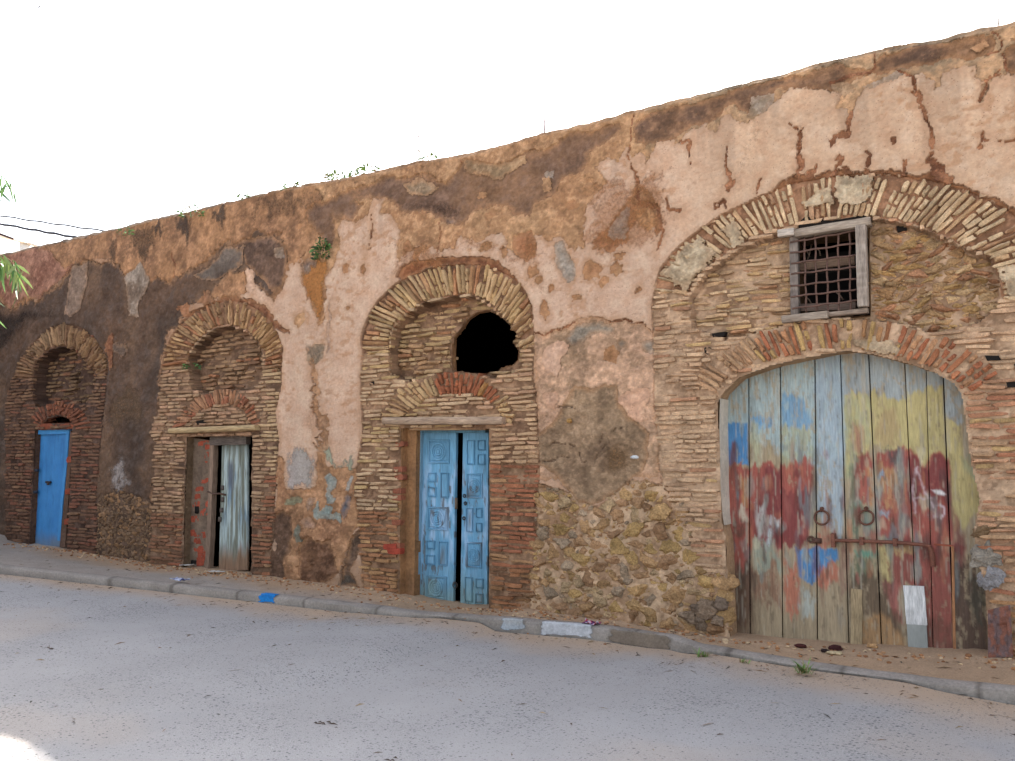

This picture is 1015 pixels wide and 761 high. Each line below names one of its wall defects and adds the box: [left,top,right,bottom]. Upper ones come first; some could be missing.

crack [788,53,954,185]
crack [978,30,1009,103]
crack [977,132,1015,150]
spalling [0,26,1015,538]
spalling [271,357,361,587]